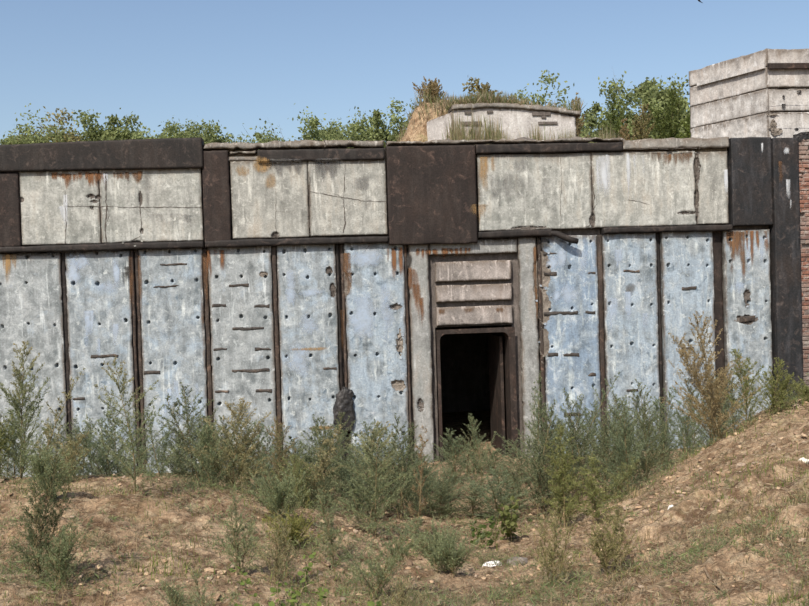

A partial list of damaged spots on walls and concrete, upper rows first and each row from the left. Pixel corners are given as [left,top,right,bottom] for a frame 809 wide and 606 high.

corrosion [51,171,142,185]
crack [275,174,386,236]
corrosion [391,247,424,313]
corrosion [726,231,768,274]